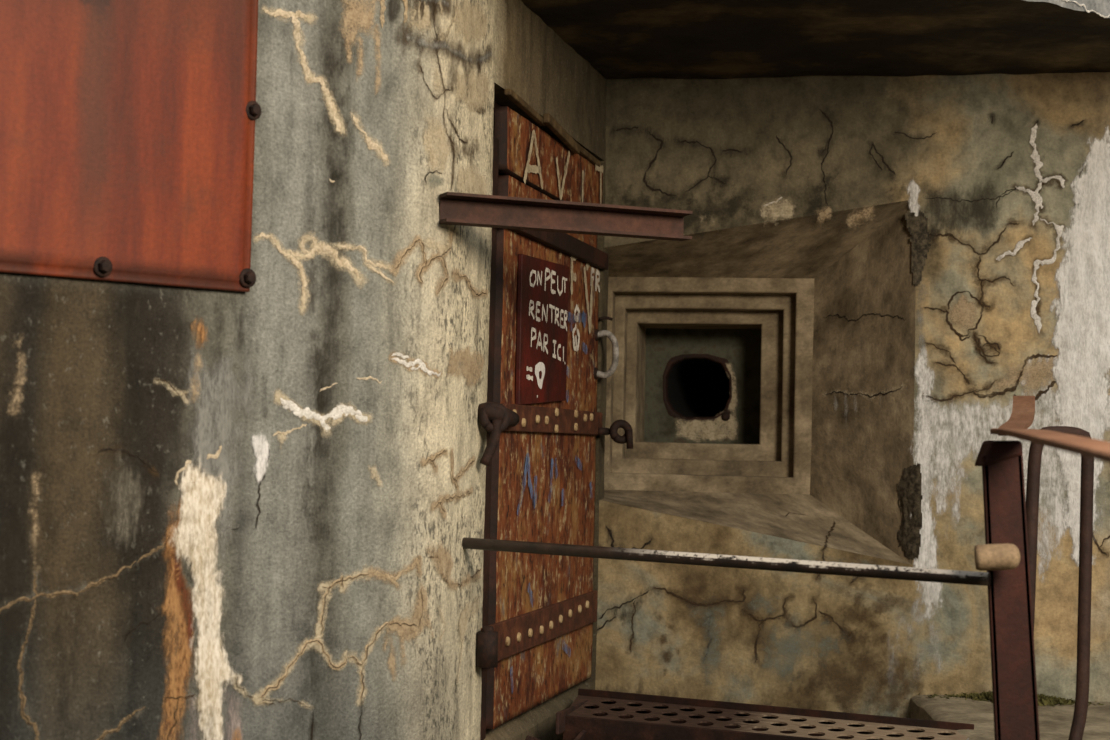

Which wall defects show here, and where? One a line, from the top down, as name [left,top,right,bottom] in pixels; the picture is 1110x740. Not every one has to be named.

crack [613,127,740,196]
crack [776,135,792,174]
crack [818,108,834,205]
crack [869,132,936,174]
crack [823,152,1019,402]
crack [0,536,170,740]
rust [160,500,195,740]
water stain [173,359,252,740]
rust [228,701,242,740]
crack [234,574,423,740]
crack [597,521,855,662]